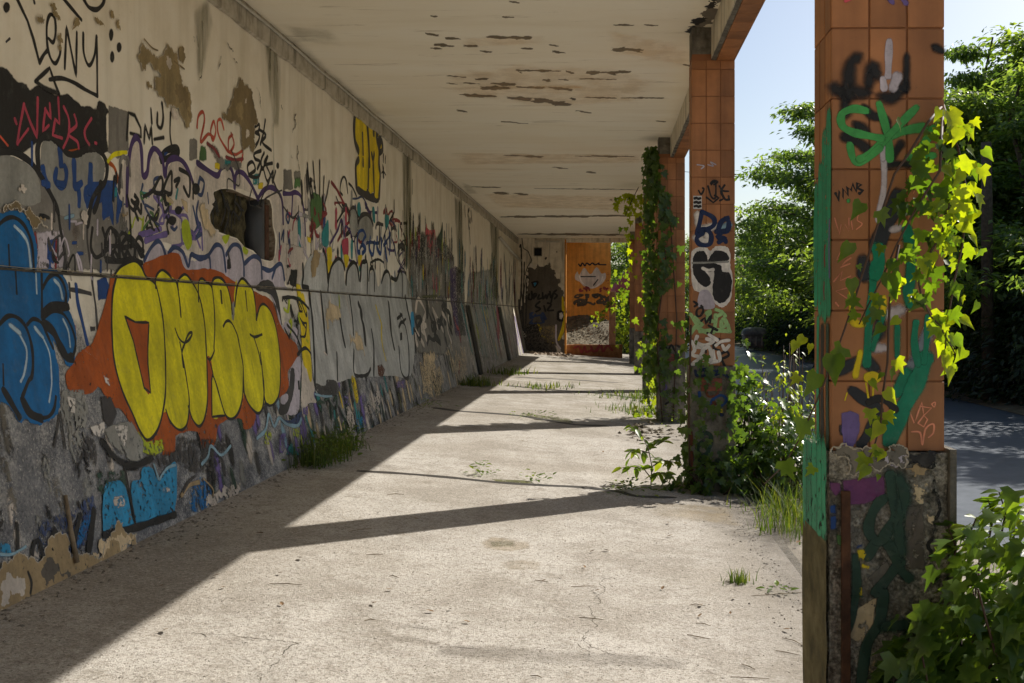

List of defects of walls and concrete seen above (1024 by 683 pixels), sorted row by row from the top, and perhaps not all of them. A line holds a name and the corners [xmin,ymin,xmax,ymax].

peeling [425,33,533,53]
peeling [137,38,192,129]
peeling [222,77,258,154]
peeling [448,69,664,113]
spalling [200,189,275,261]
peeling [91,422,128,447]
spalling [829,443,942,569]
spalling [0,496,137,611]
spalling [851,561,890,642]